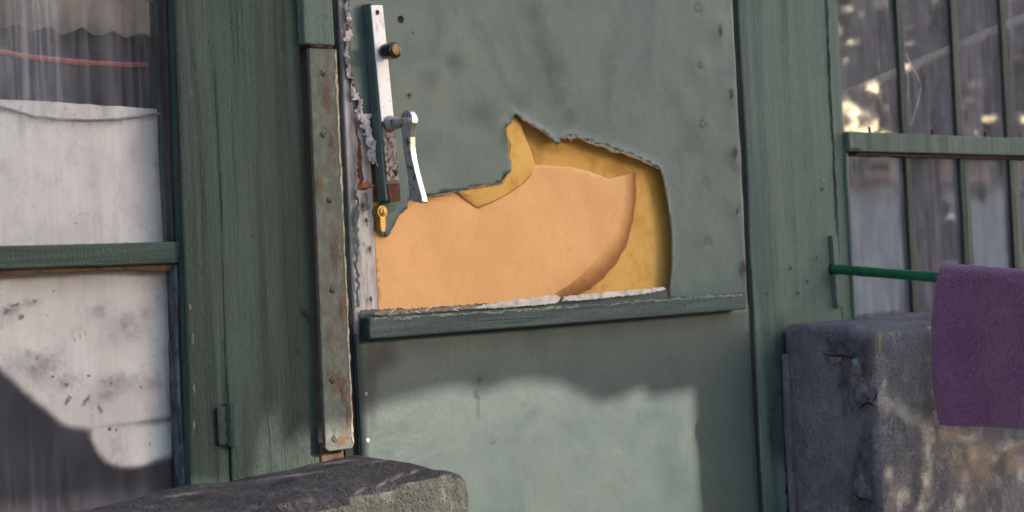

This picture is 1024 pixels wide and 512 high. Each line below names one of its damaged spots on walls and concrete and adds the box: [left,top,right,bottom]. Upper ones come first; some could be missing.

peeling [342,2,378,167]
crack [826,0,840,255]